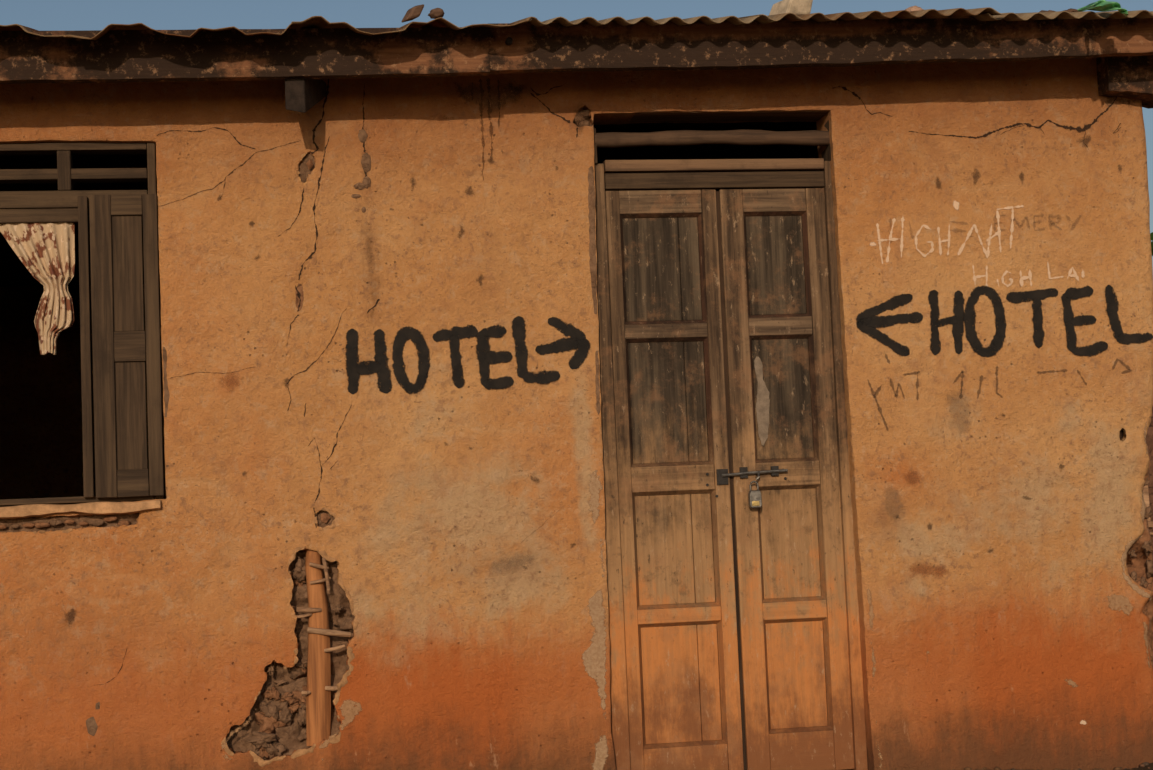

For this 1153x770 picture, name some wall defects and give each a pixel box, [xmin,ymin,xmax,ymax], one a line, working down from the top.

crack [157,79,330,343]
spalling [297,152,315,186]
crack [834,86,1121,149]
crack [286,299,380,527]
spalling [0,513,139,534]
spalling [221,547,362,767]
flaking render [582,539,607,716]
spalling [1106,423,1153,669]
flaking render [592,735,608,770]